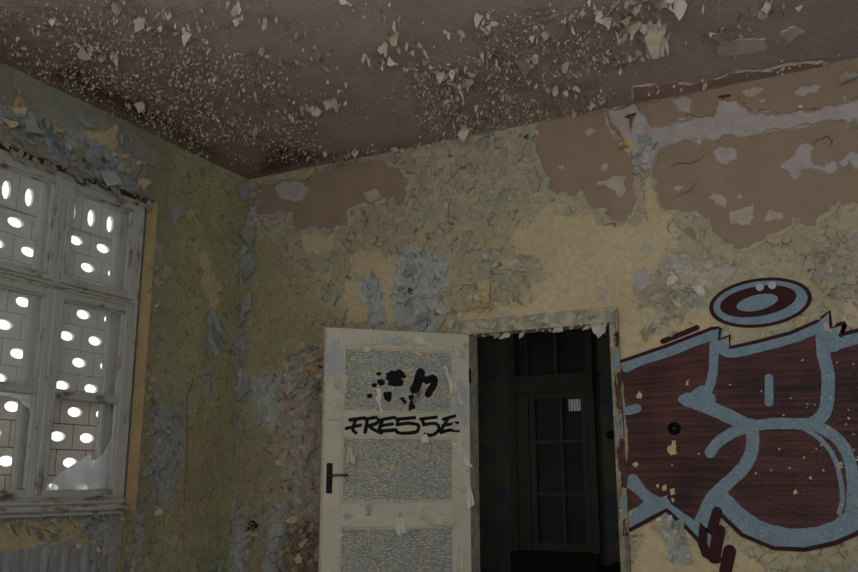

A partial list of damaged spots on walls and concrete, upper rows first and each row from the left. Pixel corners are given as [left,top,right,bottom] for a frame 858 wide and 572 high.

peeling [0,3,72,58]
peeling [68,46,163,66]
peeling [111,0,363,139]
flaking render [286,0,858,341]
peeling [204,183,262,427]
peeling [656,515,694,565]